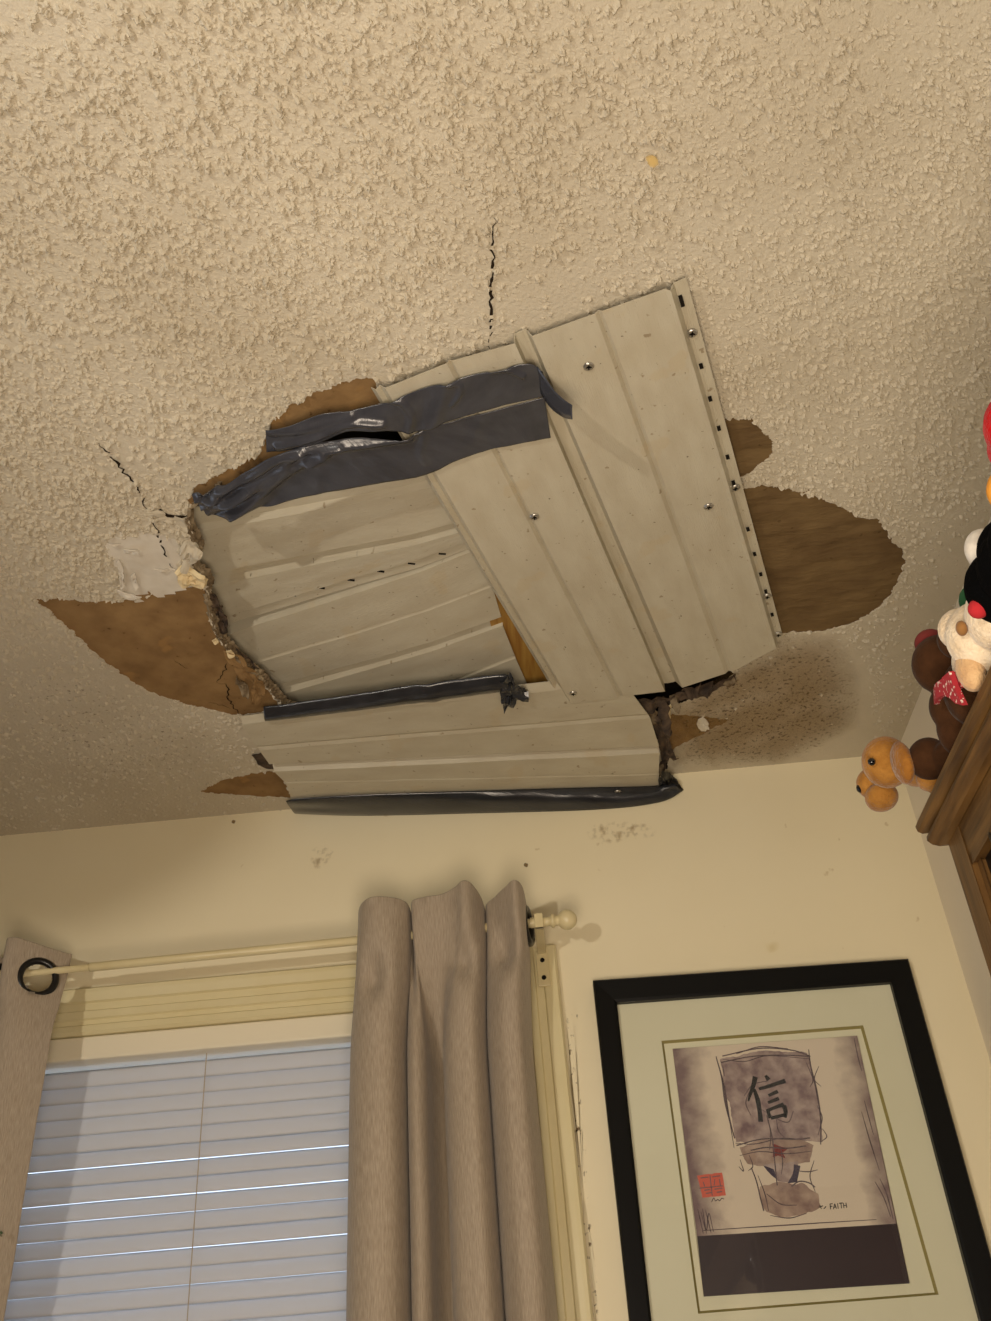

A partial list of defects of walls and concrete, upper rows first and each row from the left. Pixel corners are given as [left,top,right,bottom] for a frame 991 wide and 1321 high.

crack [488,218,498,349]
peeling [37,377,381,715]
peeling [725,418,905,635]
peeling [201,753,290,798]
peeling [669,714,729,750]